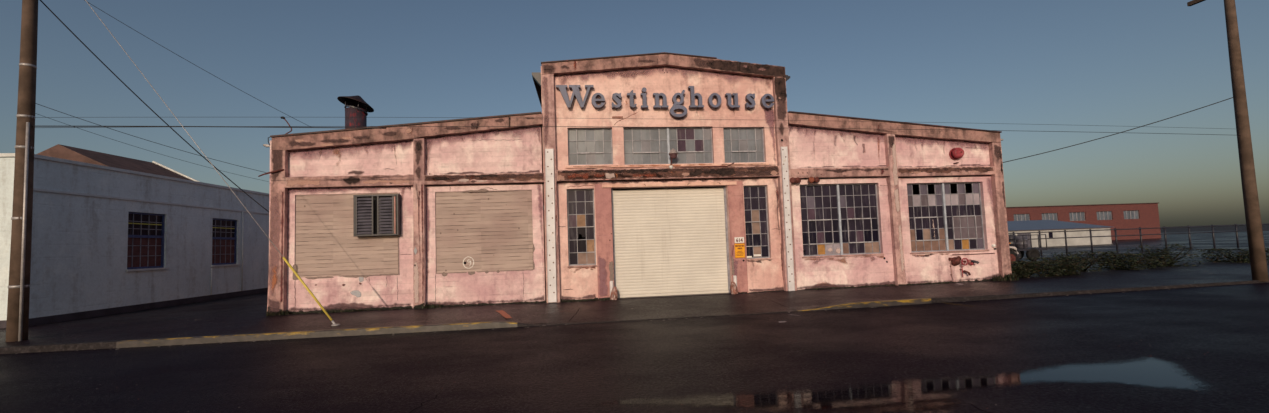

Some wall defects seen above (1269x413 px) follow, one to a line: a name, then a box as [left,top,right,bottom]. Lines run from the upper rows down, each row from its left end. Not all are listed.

damp [266,58,1006,315]
spalling [293,235,419,303]
spalling [436,244,535,276]